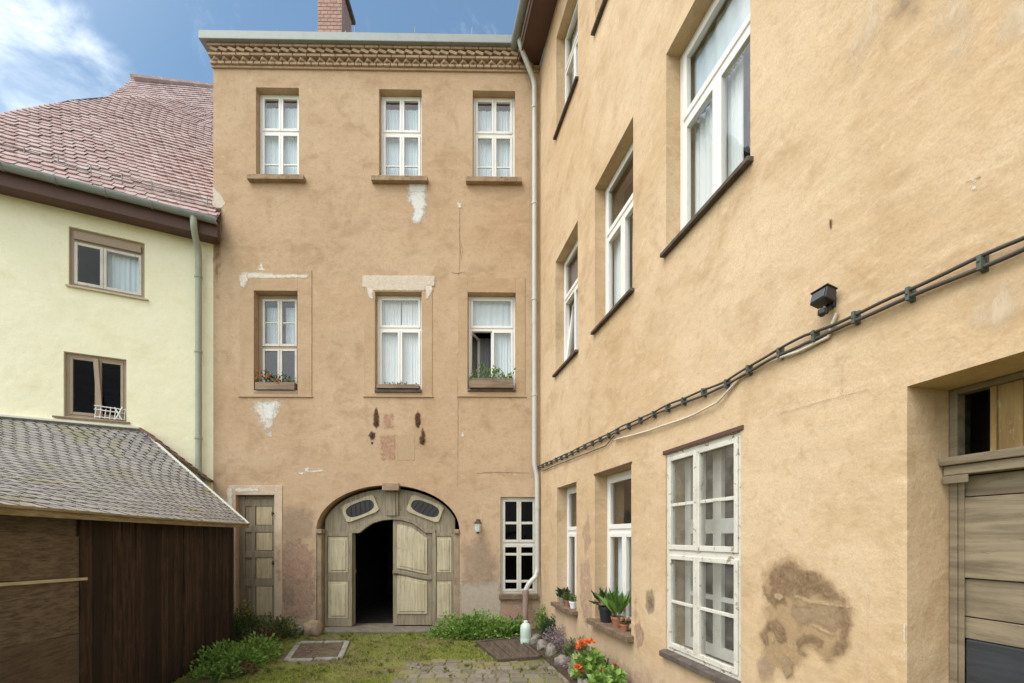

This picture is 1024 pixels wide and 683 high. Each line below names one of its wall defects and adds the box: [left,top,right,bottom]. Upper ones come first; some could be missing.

peeling [408,184,427,223]
peeling [254,401,281,437]
spalling [646,590,654,613]
spalling [758,561,850,678]